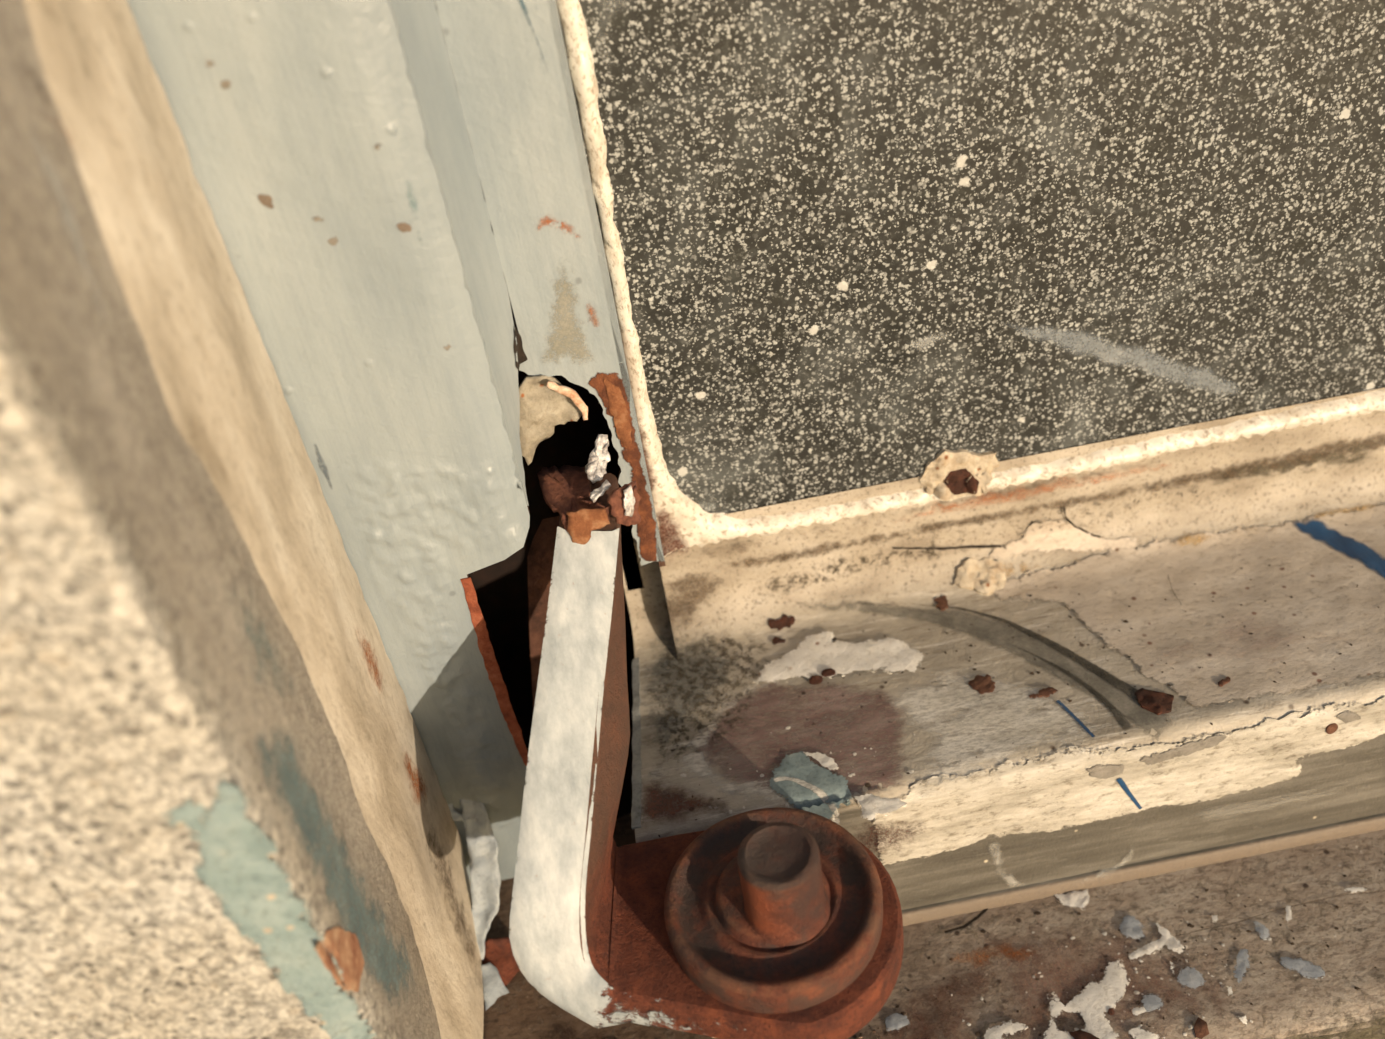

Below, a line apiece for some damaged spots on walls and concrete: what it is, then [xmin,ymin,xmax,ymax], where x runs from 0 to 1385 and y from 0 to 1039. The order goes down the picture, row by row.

peeling [754,631,924,685]
corrosion [858,821,921,853]
spalling [314,927,365,992]
corrosion [481,937,521,1010]
peeling [984,923,1185,1039]